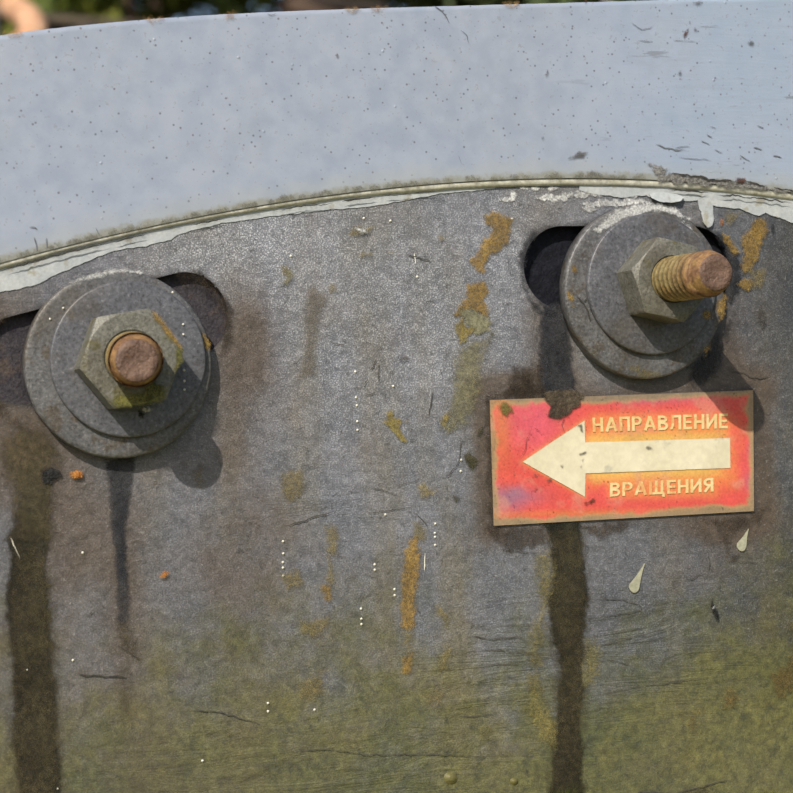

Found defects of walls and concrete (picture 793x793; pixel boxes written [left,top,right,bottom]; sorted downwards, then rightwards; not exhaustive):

peeling [0,187,495,292]
corrosion [470,212,512,272]
peeling [499,164,793,228]
corrosion [721,218,768,291]
corrosion [443,282,491,432]
leakage [509,304,576,398]
leakage [4,429,60,793]
leakage [107,458,134,624]
corrosion [401,535,419,630]
leakage [544,521,589,793]